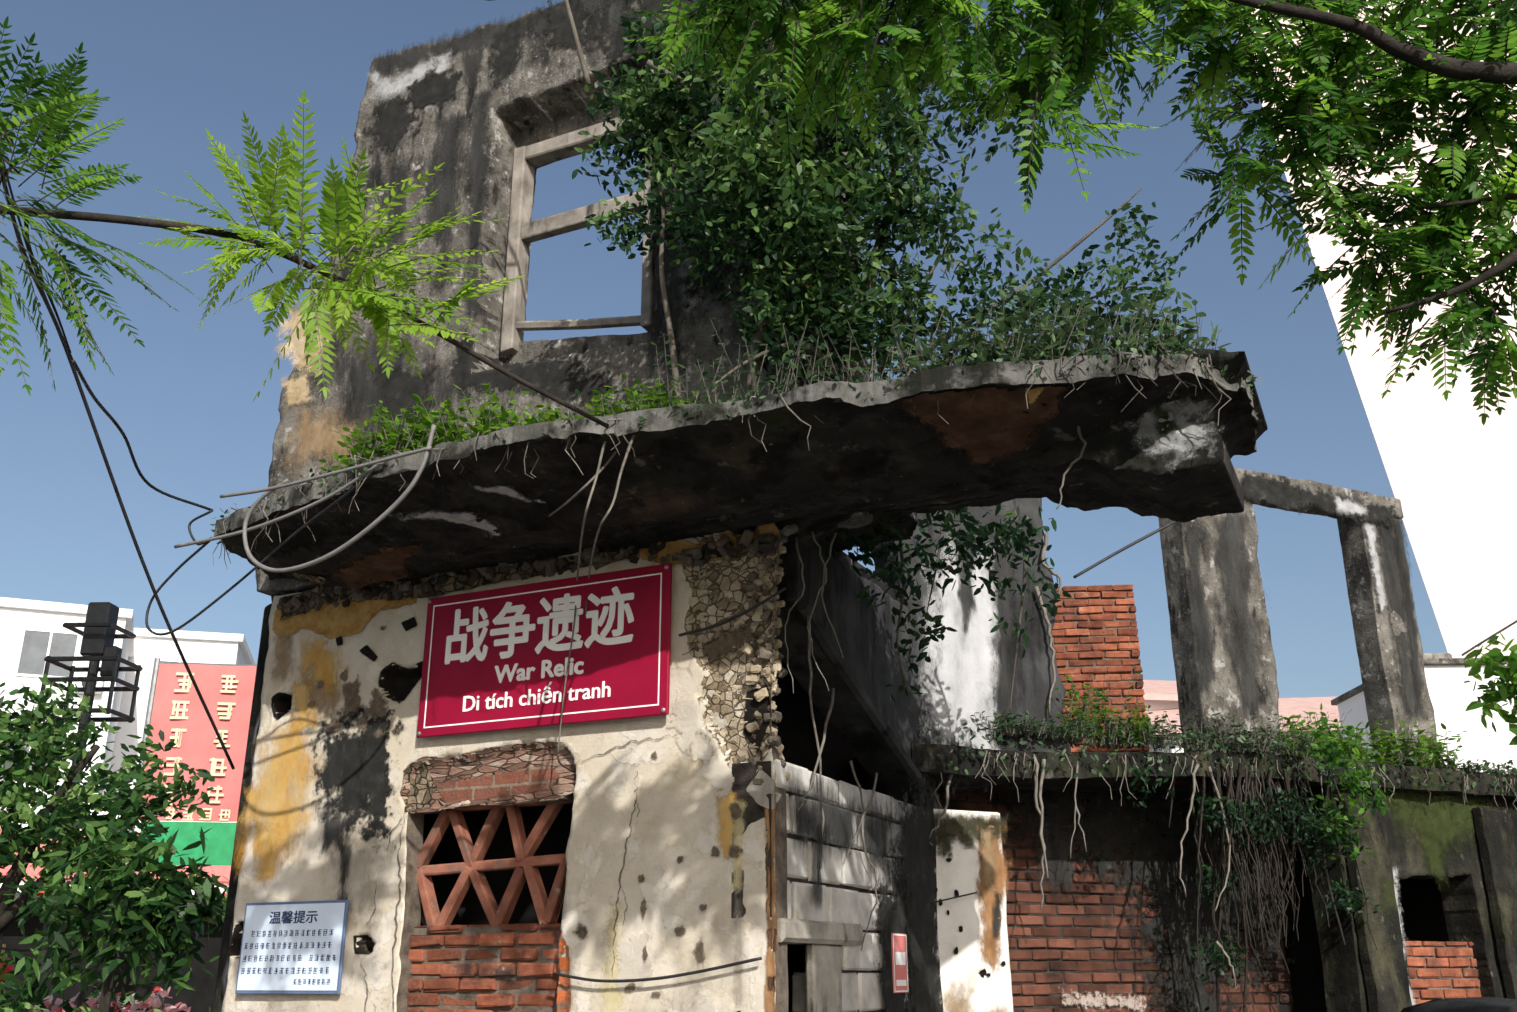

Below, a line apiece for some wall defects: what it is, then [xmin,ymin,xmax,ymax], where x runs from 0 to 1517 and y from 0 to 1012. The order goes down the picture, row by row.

damp [289,0,712,461]
damp [648,62,773,374]
spalling [272,523,786,819]
damp [958,532,976,632]
damp [996,549,1015,733]
damp [1186,473,1427,718]
damp [234,664,404,929]
crack [574,733,680,980]
spalling [674,926,705,962]
spalling [711,846,743,859]
crack [735,912,743,1012]
damp [789,755,1008,1012]